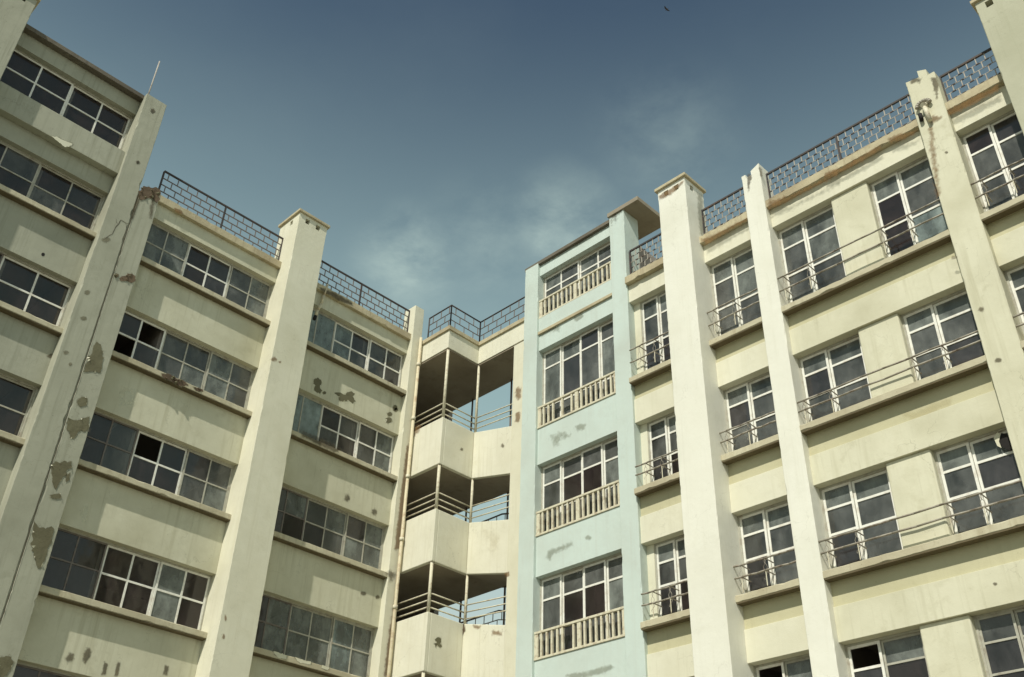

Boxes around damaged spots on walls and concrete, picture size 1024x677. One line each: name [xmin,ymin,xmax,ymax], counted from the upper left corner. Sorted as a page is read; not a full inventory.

spalling [138,186,161,203]
spalling [114,273,136,283]
peeling [83,342,104,373]
peeling [314,378,356,404]
crack [0,194,139,622]
peeling [67,397,90,438]
peeling [51,461,72,499]
peeling [31,522,54,568]
peeling [0,656,14,677]